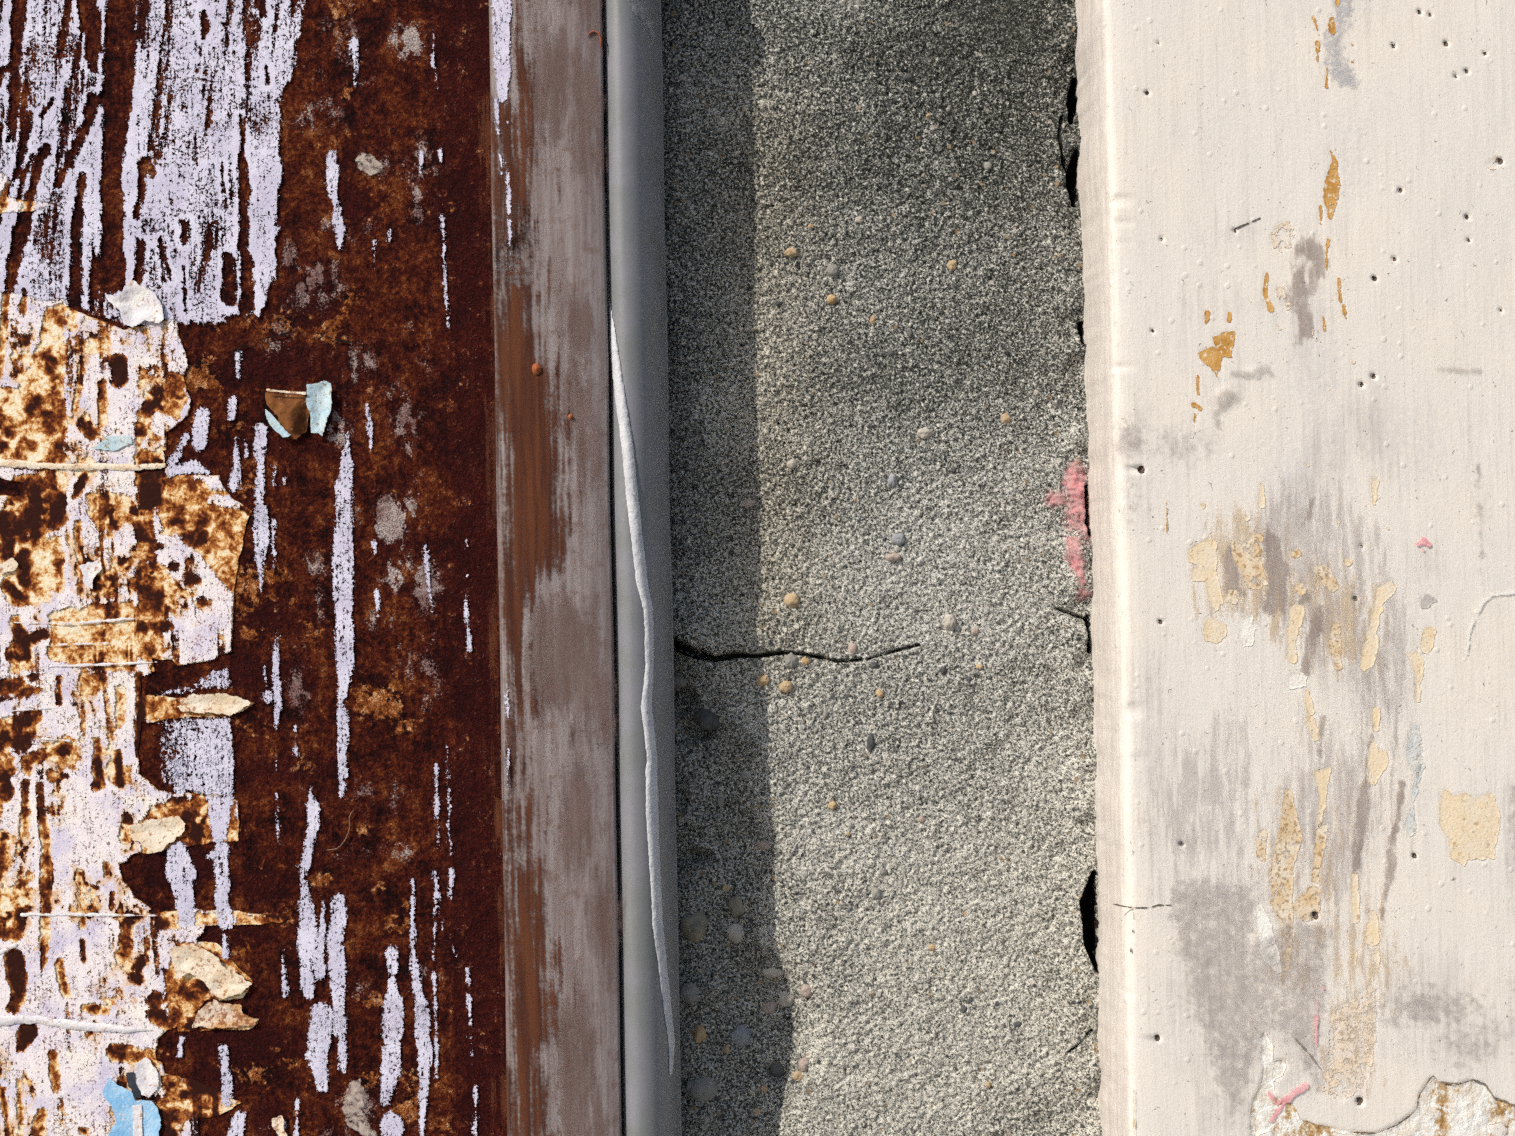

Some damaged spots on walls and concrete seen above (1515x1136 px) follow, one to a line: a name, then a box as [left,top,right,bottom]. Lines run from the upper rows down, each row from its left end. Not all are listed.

peeling [347,36,359,87]
peeling [326,150,346,250]
peeling [439,215,450,327]
peeling [306,381,332,436]
peeling [0,0,305,1136]
peeling [330,431,377,798]
peeling [463,595,472,652]
corrosion [471,0,604,1136]
crack [674,640,920,663]
peeling [281,787,348,1092]
peeling [379,746,474,1136]
spalling [1250,1031,1515,1136]